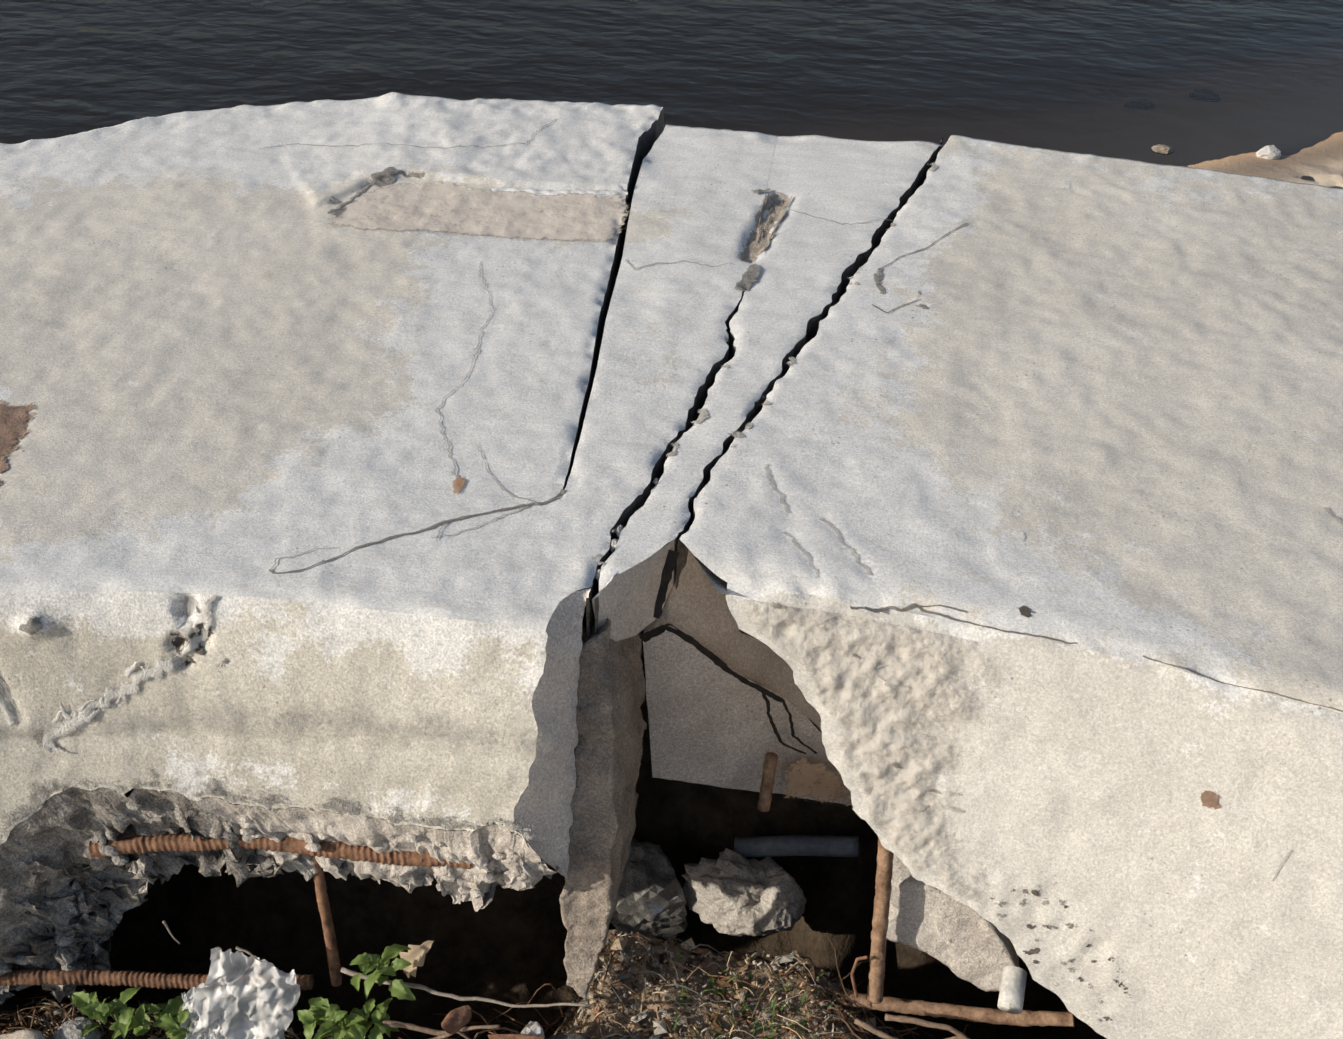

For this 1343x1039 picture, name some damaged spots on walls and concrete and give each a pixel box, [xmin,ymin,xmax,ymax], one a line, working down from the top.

peeling [328,167,628,242]
spalling [734,188,792,290]
crack [269,111,726,574]
rust [0,400,35,484]
crack [586,137,968,754]
crack [850,603,1077,644]
crack [1142,655,1343,712]
rust [782,758,852,806]
rust [0,968,208,990]
rust [88,834,471,991]
spalling [0,769,560,1005]
rust [832,837,1074,1027]